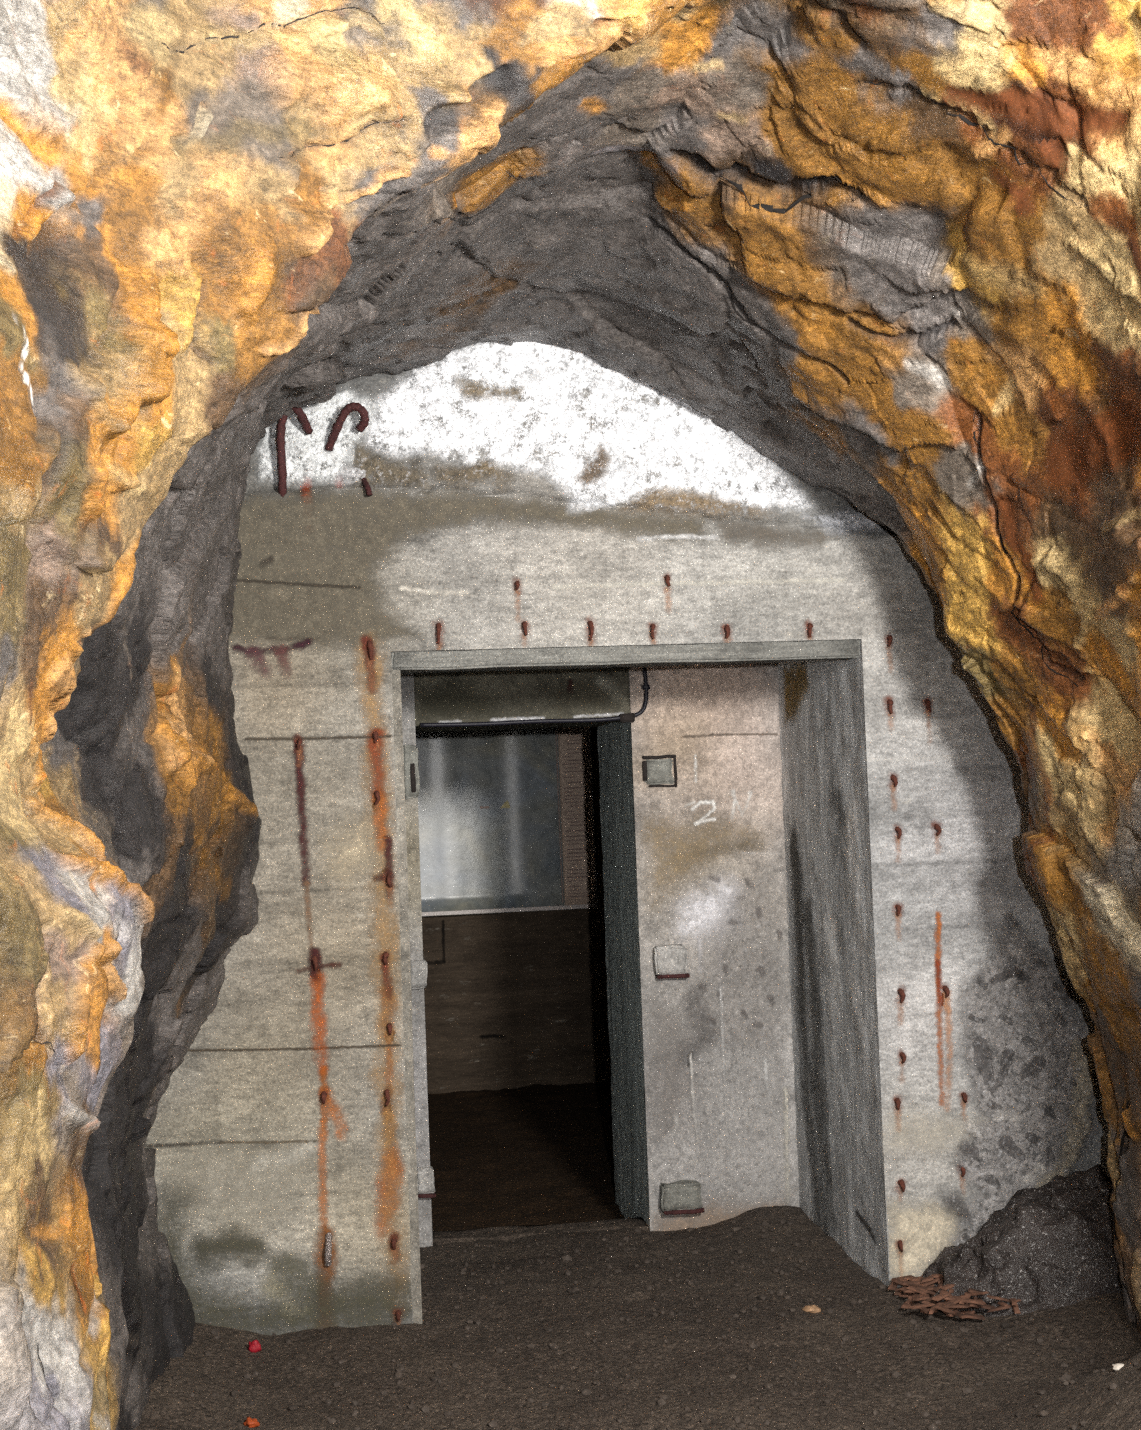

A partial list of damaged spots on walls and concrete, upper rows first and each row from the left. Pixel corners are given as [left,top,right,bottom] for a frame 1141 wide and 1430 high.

corrosion [233,637,311,670]
corrosion [294,736,311,917]
corrosion [362,637,395,1065]
corrosion [300,948,341,1044]
corrosion [935,912,951,1103]
leakage [199,1143,317,1211]
corrosion [316,1066,336,1297]
corrosion [381,1090,399,1258]
leakage [157,1213,408,1336]